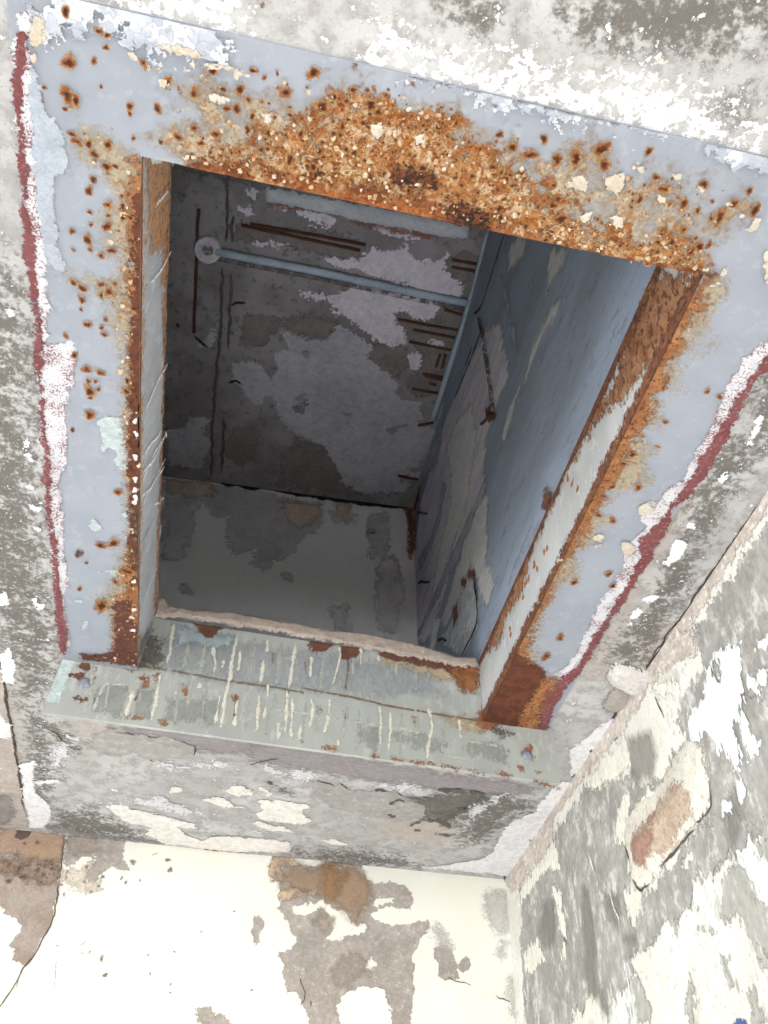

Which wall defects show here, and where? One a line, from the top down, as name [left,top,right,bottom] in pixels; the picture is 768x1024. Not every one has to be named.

corrosion [41,85,80,112]
corrosion [59,52,77,71]
corrosion [91,27,112,65]
peeling [8,0,260,658]
corrosion [66,64,761,732]
peeling [552,341,768,678]
water stain [43,734,82,774]
peeling [418,490,768,1024]
crack [0,839,64,1007]
spalling [0,760,141,966]
peeling [105,779,430,1024]
water stain [280,861,371,923]